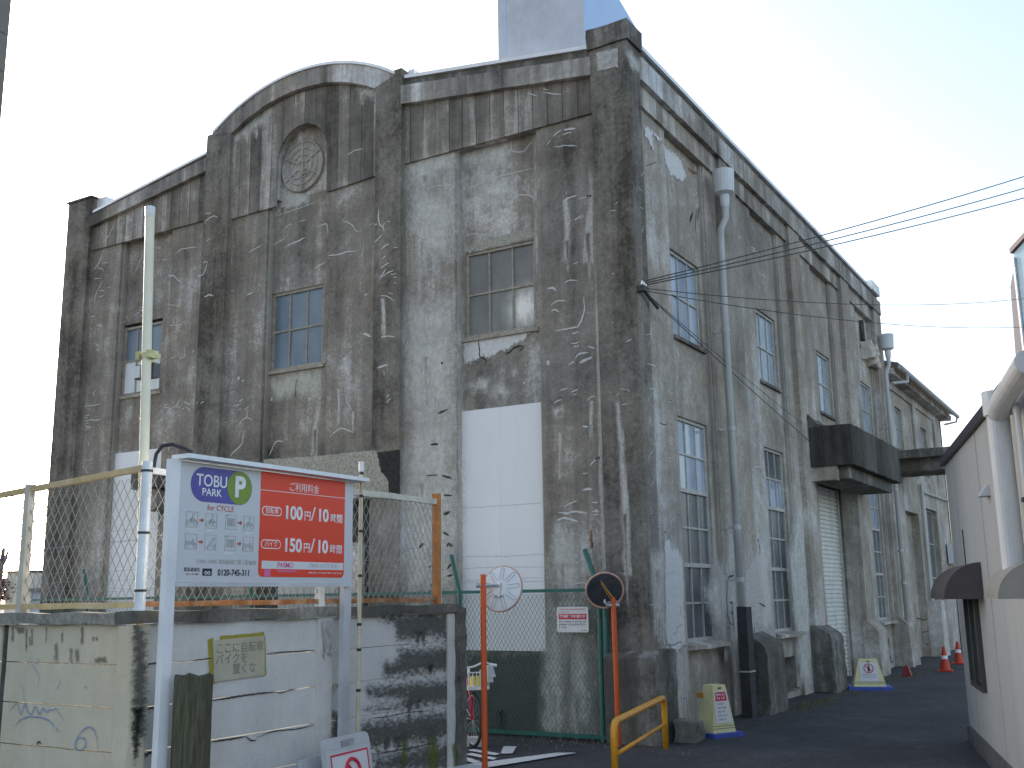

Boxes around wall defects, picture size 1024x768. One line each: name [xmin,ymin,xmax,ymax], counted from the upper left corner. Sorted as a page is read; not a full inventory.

peeling [643,123,686,182]
peeling [462,327,530,364]
crack [478,341,524,366]
damp [131,624,148,759]
mould [362,613,448,768]